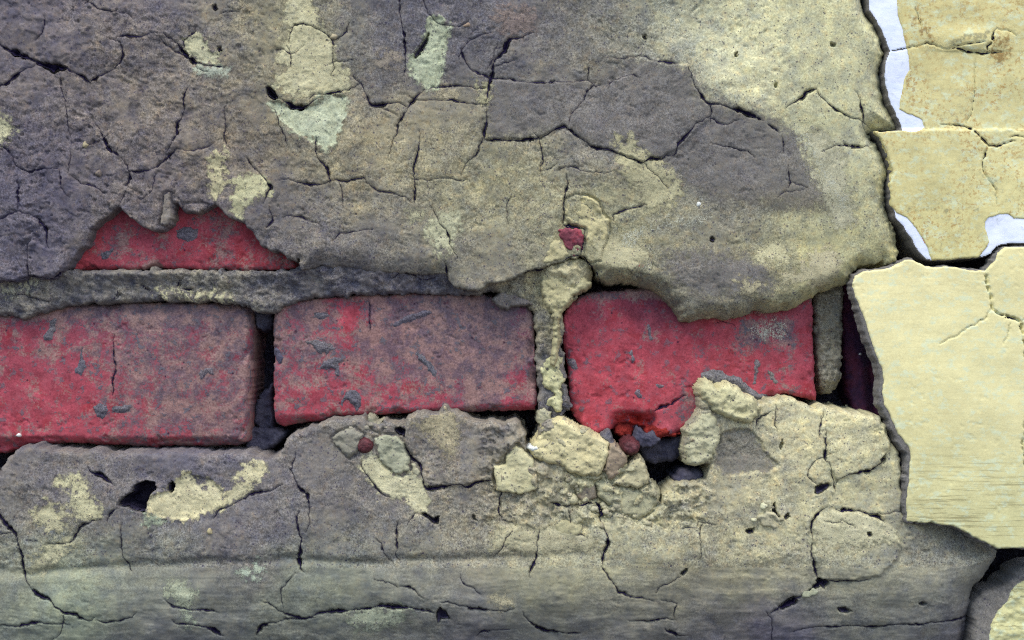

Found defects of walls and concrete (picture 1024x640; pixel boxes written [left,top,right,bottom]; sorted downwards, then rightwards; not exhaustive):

crack [0,0,805,302]
crack [788,88,868,151]
peeling [869,0,924,132]
crack [896,18,1022,188]
peeling [894,210,932,260]
peeling [980,214,1024,257]
spalling [610,422,681,439]
crack [0,514,133,640]
crack [48,468,131,570]
crack [215,446,577,635]
crack [551,502,687,636]
crack [767,411,965,640]